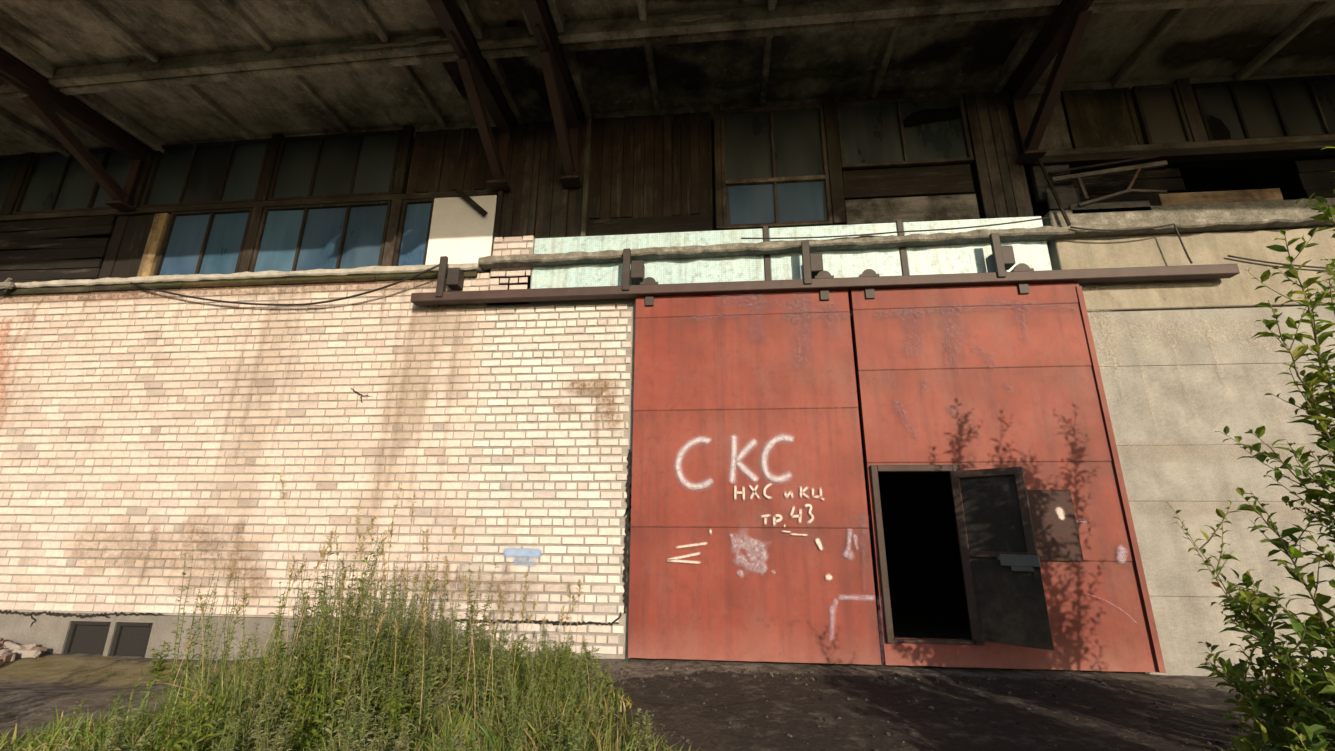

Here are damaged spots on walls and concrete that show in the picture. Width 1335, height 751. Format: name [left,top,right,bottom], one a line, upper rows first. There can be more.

damp [1160,16,1335,69]